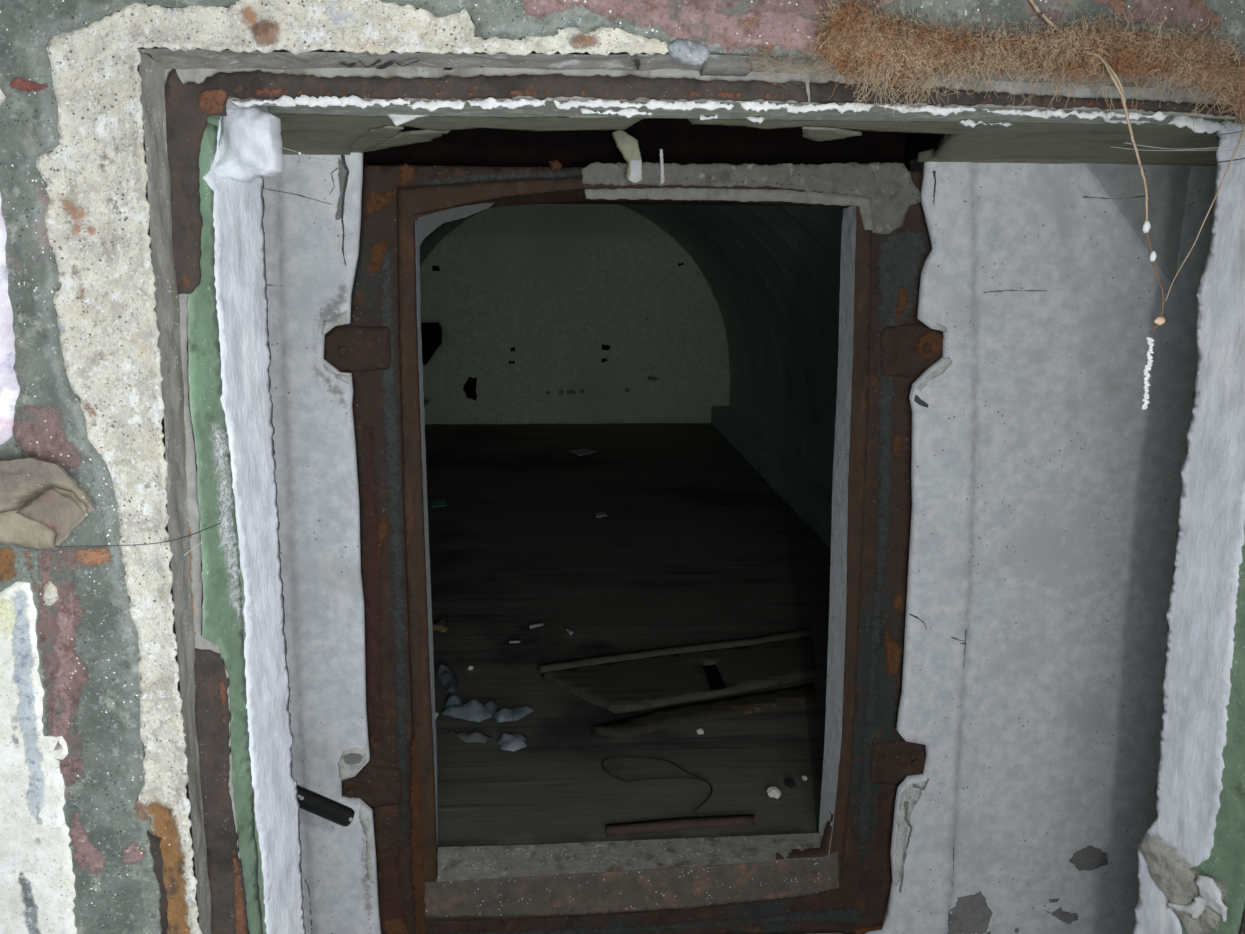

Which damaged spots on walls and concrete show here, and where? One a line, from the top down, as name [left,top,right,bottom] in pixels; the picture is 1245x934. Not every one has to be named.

spalling [232,95,1226,197]
rust [366,164,415,215]
rust [917,331,944,358]
spalling [0,0,897,934]
rust [362,426,389,742]
rust [134,801,191,934]
peeling [1069,845,1108,871]
rust [855,925,882,934]
peeling [947,891,993,934]
peeling [1167,875,1228,922]